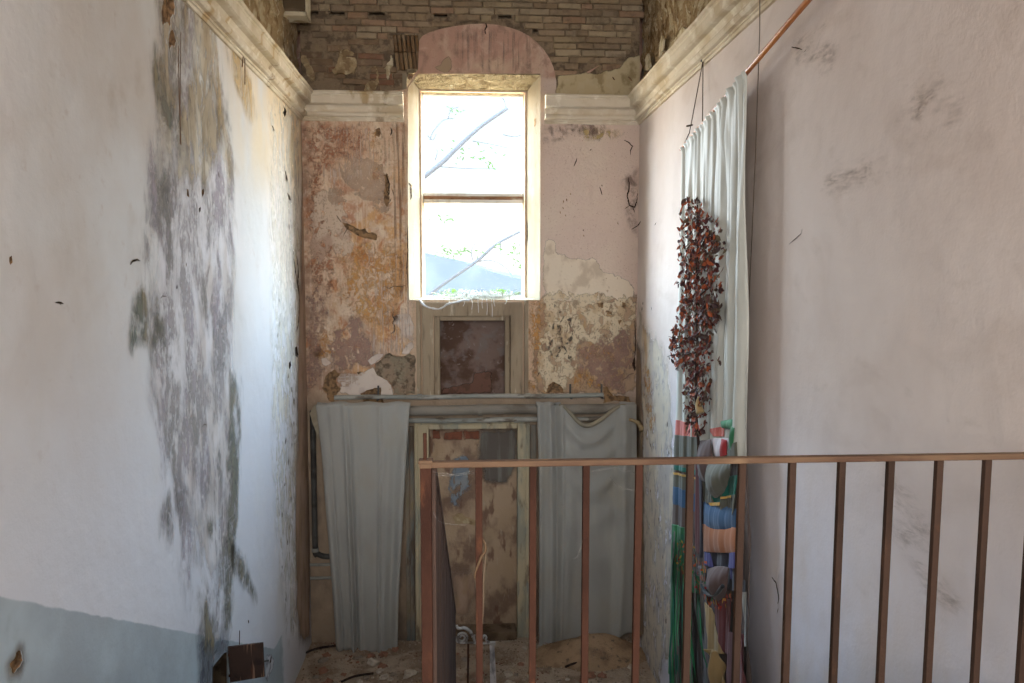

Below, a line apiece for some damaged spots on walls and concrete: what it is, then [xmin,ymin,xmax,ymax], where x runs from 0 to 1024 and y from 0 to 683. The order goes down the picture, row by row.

flaking render [243,0,711,95]
peeling [310,158,390,263]
crack [624,140,656,229]
damp [130,3,254,683]
flaking render [321,314,416,403]
peeling [543,240,636,403]